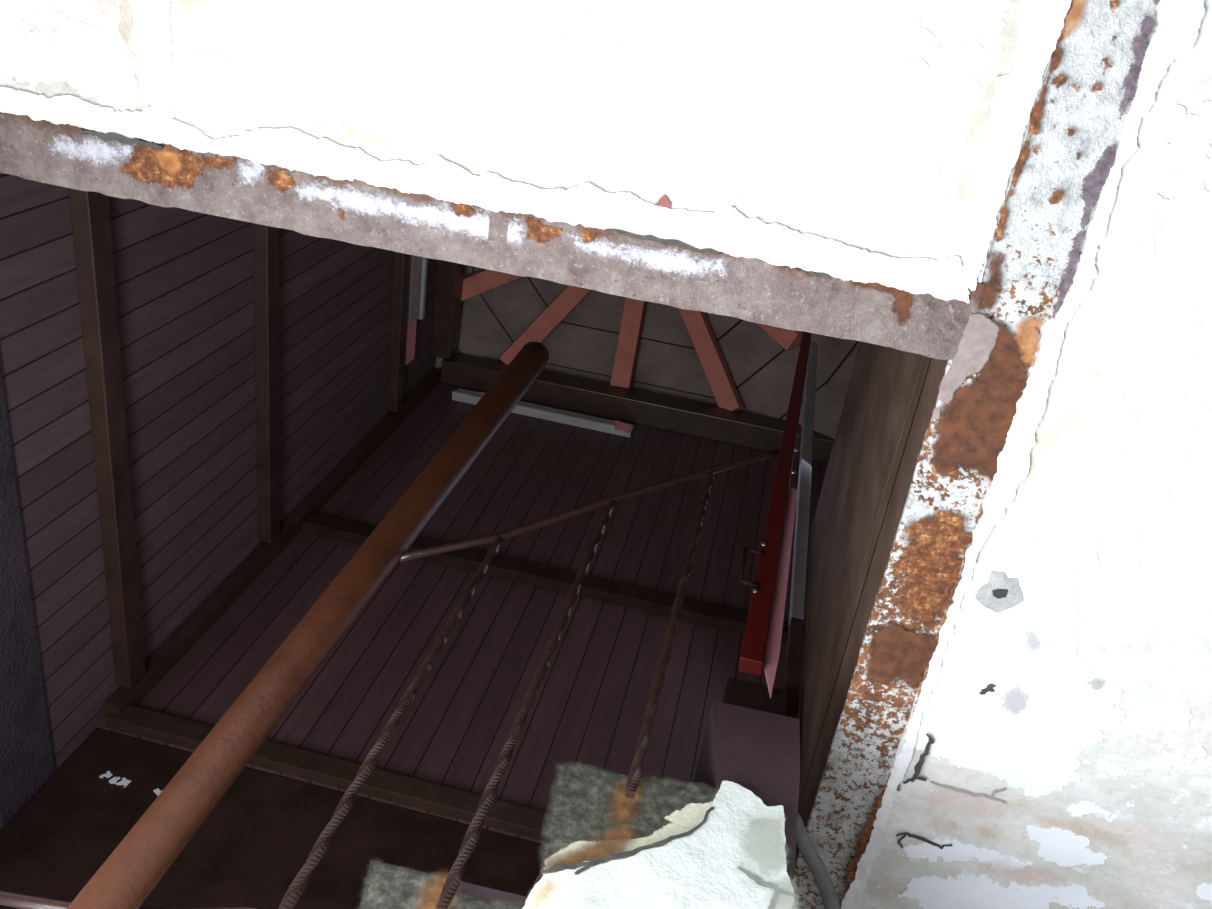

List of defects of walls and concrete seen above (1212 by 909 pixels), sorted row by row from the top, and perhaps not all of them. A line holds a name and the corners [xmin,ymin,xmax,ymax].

peeling [1118,0,1160,120]
corrosion [118,146,237,189]
corrosion [451,203,474,218]
corrosion [526,217,562,244]
peeling [1052,144,1116,320]
corrosion [853,281,912,325]
corrosion [865,0,1113,719]
peeling [915,535,1129,798]
flaking render [359,862,441,909]
flaking render [541,764,719,878]
corrosion [843,772,901,893]
peeling [898,800,1135,909]